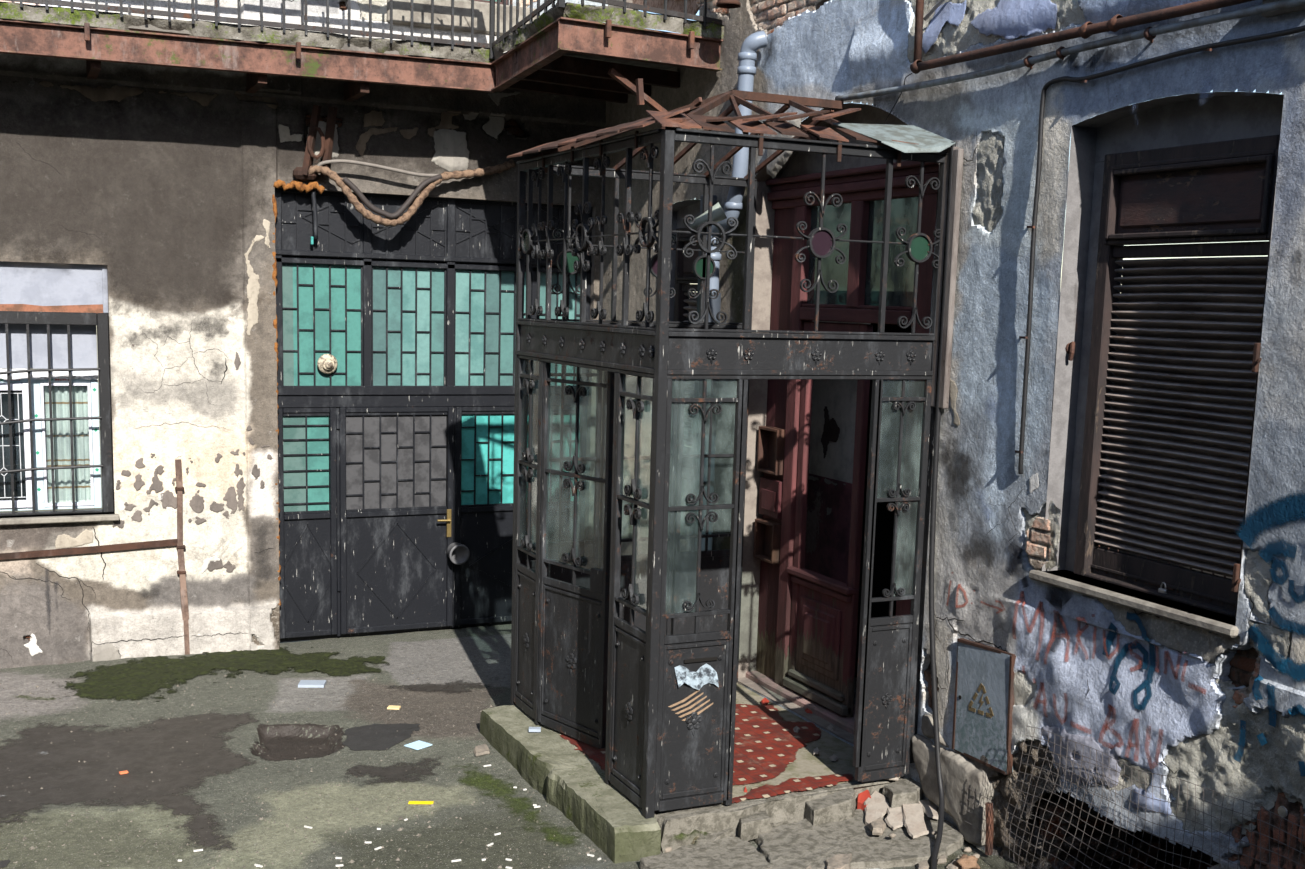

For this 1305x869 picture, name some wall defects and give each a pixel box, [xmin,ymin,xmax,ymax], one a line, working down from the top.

spalling [339,0,387,22]
spalling [750,0,830,34]
spalling [907,0,1086,63]
spalling [972,132,1005,232]
peeling [113,425,274,528]
peeling [1029,473,1039,493]
corrosion [0,459,190,655]
crack [2,528,243,654]
peeling [201,556,236,576]
spalling [1024,499,1061,570]
spalling [991,549,1305,869]